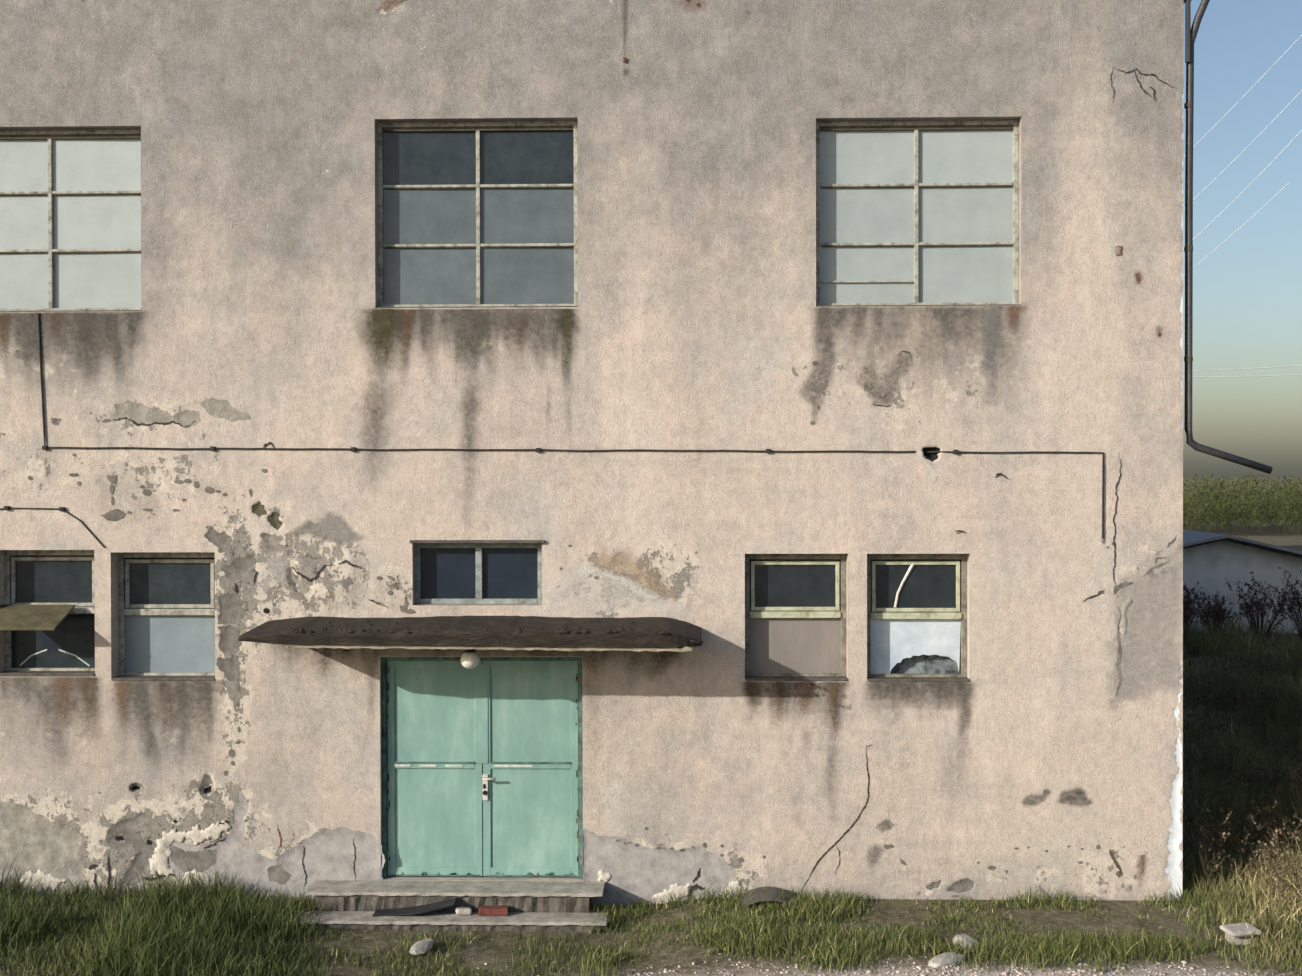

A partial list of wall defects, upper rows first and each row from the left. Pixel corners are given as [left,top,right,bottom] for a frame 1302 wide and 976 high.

crack [1111,66,1178,101]
damp [0,312,142,365]
damp [366,308,573,369]
damp [817,307,863,334]
flaking render [102,397,250,428]
crack [1083,458,1176,697]
flaking render [204,526,258,707]
damp [116,681,212,726]
damp [745,682,844,727]
peeling [1165,658,1183,901]
flaking render [0,791,390,900]
flaking render [527,809,745,905]